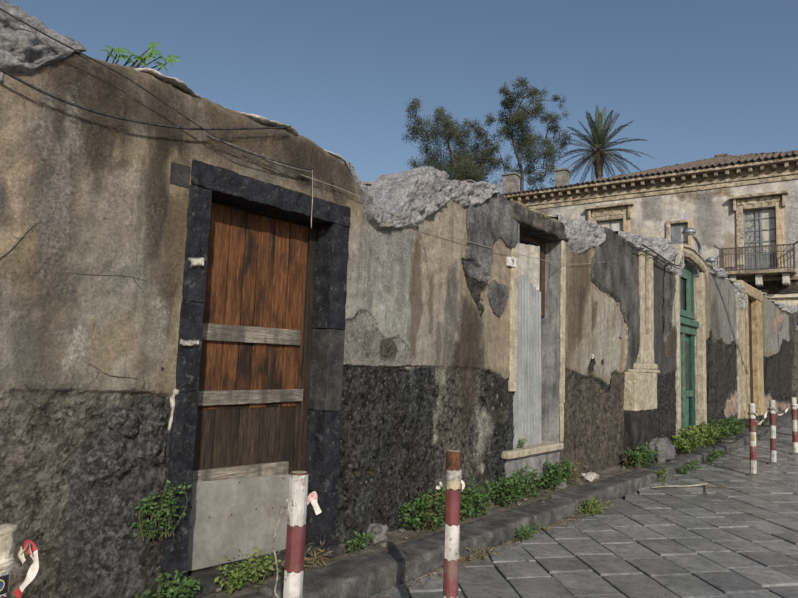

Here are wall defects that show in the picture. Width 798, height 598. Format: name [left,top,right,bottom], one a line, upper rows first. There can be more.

leakage [14,53,128,393]
leakage [139,82,187,291]
peeling [343,310,412,366]
spalling [462,257,488,316]
peeling [560,227,646,479]